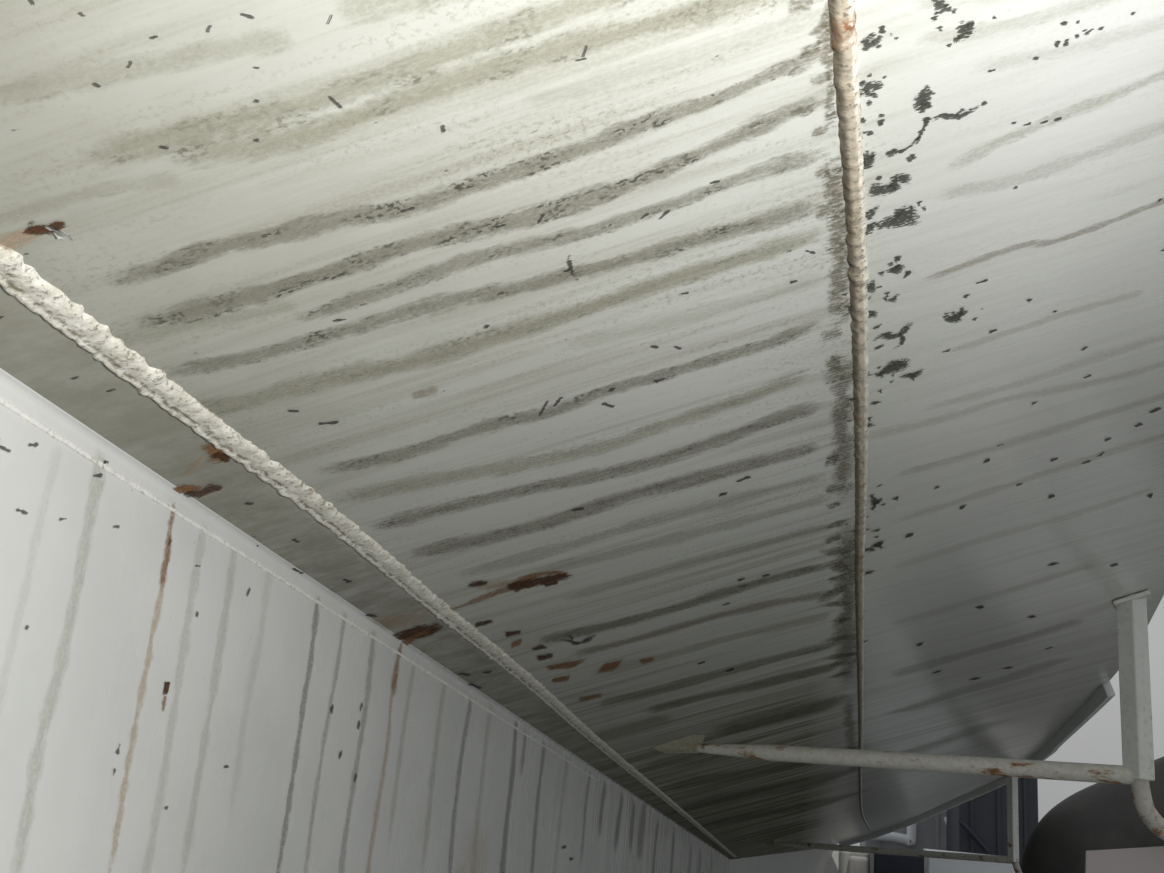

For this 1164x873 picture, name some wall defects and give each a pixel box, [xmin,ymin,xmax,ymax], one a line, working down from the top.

corrosion [204,444,232,463]
corrosion [173,484,222,498]
corrosion [452,571,573,611]
corrosion [393,623,442,685]
corrosion [505,631,584,683]
water stain [278,599,319,873]